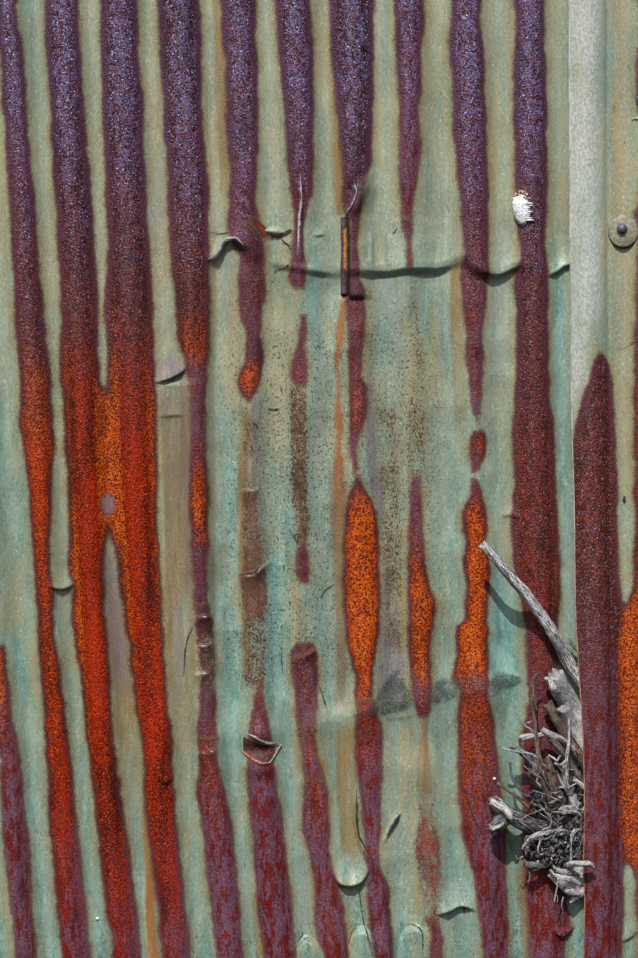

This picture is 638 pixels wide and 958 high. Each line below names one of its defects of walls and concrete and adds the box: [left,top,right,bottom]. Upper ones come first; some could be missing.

corrosion [0,0,193,958]
corrosion [155,0,298,958]
corrosion [272,0,318,290]
corrosion [286,309,350,958]
corrosion [325,0,441,958]
corrosion [415,797,446,958]
corrosion [443,0,510,958]
corrosion [508,0,638,958]